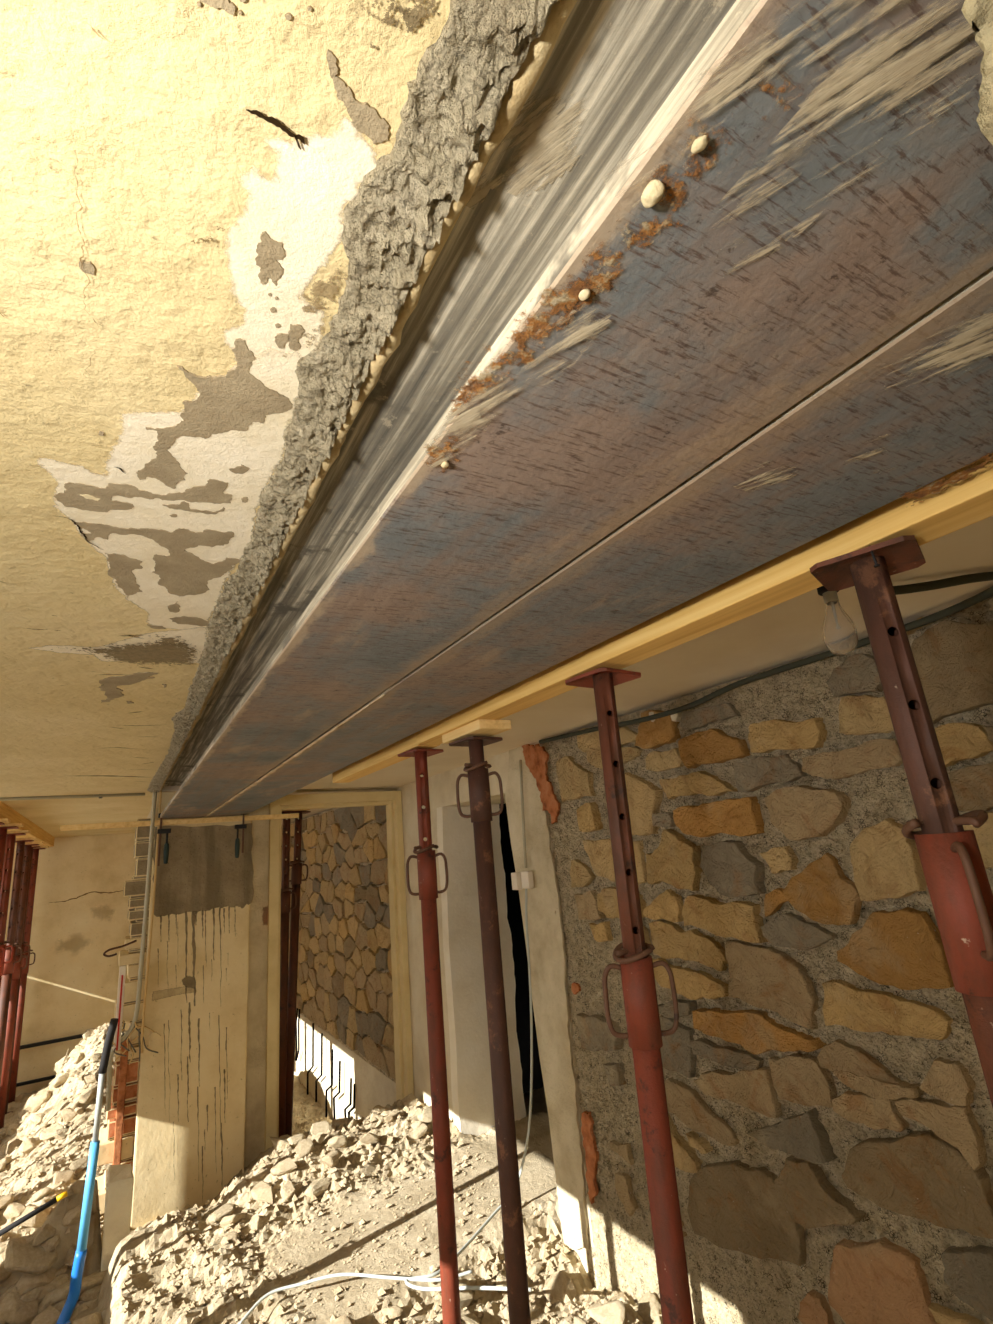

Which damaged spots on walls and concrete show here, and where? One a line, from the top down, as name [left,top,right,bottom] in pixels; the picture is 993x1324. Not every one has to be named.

peeling [197,0,246,15]
peeling [347,0,439,49]
crack [246,109,305,150]
rust [449,118,730,415]
peeling [31,49,389,704]
rust [424,436,460,473]
crack [50,891,120,903]
leakage [158,906,236,1176]